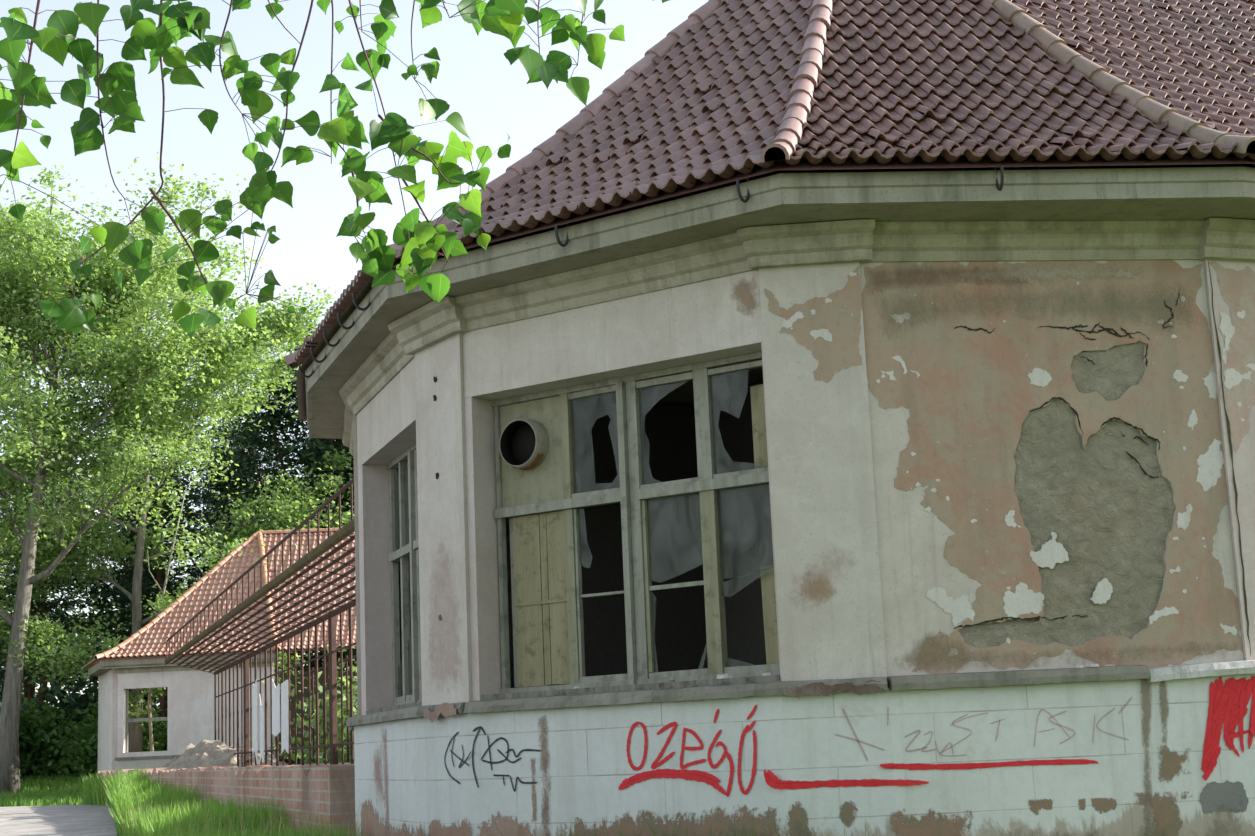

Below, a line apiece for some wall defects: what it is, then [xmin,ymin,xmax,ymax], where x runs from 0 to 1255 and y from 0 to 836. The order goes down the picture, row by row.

damp [734,282,755,312]
crack [954,326,995,334]
crack [1038,290,1180,366]
crack [1030,397,1161,478]
peeling [764,260,1255,674]
crack [1208,262,1251,657]
peeling [361,799,534,836]
peeling [561,802,812,836]
peeling [840,802,858,827]
peeling [890,809,972,836]
peeling [1028,799,1053,815]
peeling [1078,798,1117,814]